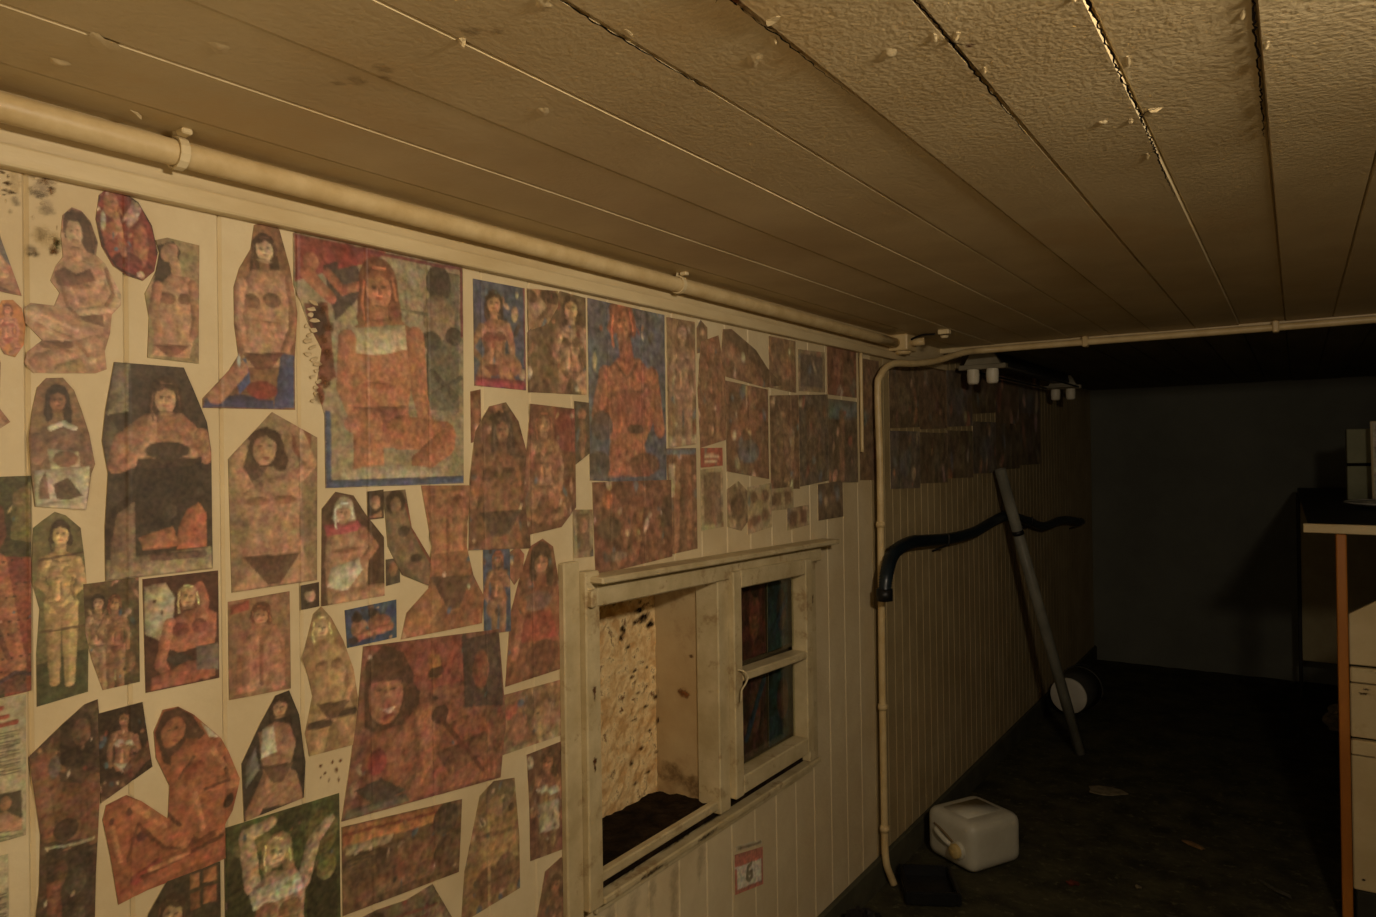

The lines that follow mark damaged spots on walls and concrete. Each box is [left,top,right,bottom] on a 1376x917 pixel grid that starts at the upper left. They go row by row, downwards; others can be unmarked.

crack [548,0,722,98]
crack [716,0,853,96]
crack [914,0,1029,137]
crack [1071,0,1175,195]
crack [1240,0,1270,136]